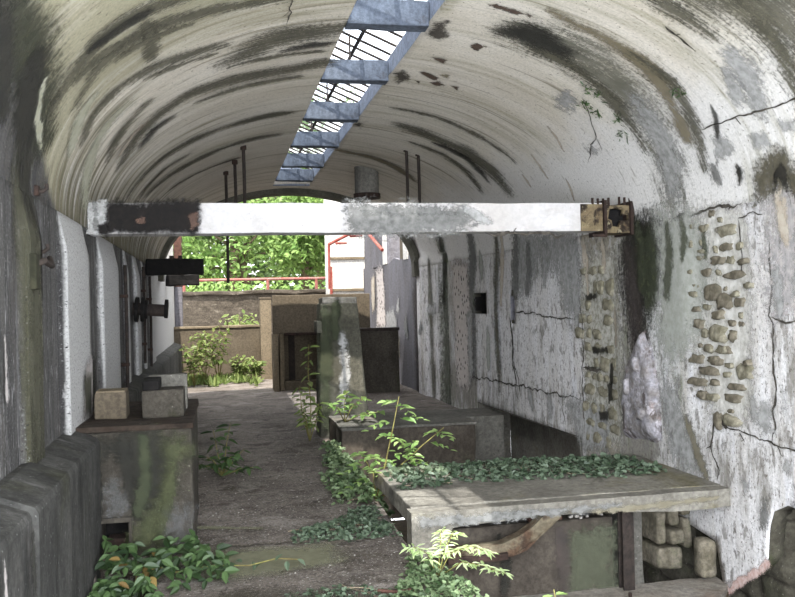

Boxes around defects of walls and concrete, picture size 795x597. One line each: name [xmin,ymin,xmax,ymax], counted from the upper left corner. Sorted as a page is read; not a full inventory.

leakage [0,0,70,298]
leakage [80,98,176,235]
leakage [73,9,196,86]
crack [472,253,601,428]
leakage [491,20,708,345]
spalling [575,245,625,452]
leakage [648,0,769,123]
crack [673,203,762,271]
spalling [687,200,788,437]
crack [700,98,795,130]
crack [706,234,795,478]
peeling [759,499,770,532]